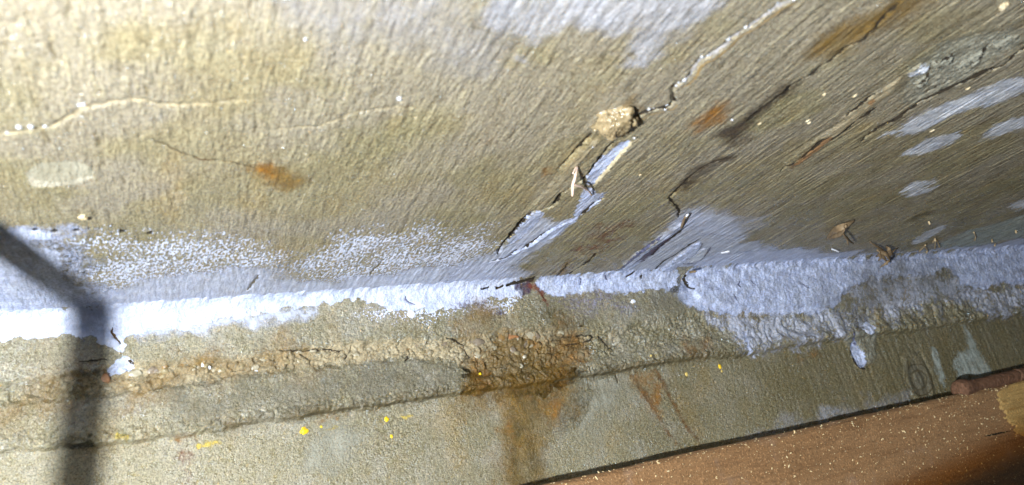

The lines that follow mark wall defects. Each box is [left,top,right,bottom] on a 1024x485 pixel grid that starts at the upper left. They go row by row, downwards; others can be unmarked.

crack [636,0,795,123]
crack [746,2,900,122]
crack [0,99,419,135]
crack [779,47,1024,172]
crack [149,138,254,168]
crack [489,119,614,262]
crack [667,159,724,217]
water stain [0,105,1024,376]
crack [556,253,596,276]
spalling [81,327,612,393]
spalling [846,332,876,370]
corrosion [630,371,699,439]